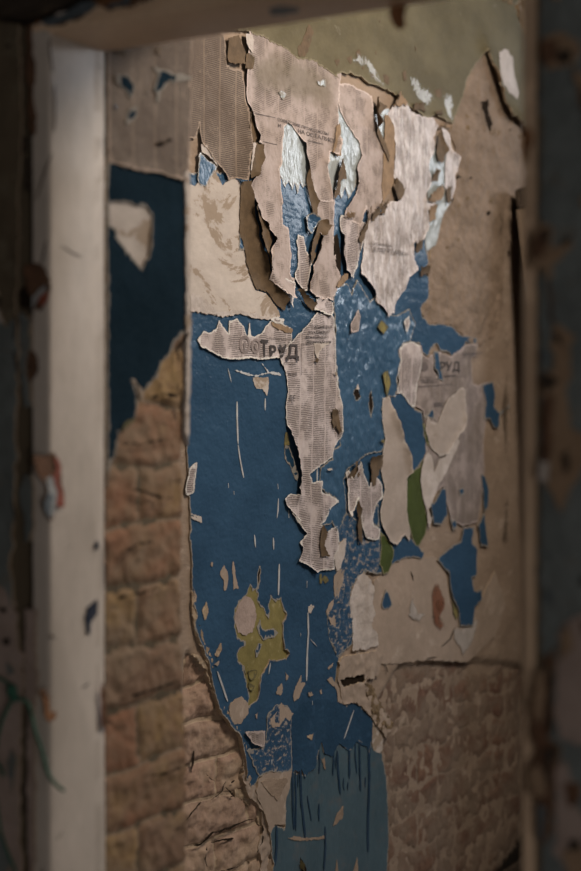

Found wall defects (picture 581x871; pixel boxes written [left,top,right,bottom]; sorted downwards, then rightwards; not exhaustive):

spalling [36,0,149,26]
peeling [116,74,138,126]
peeling [146,66,192,102]
peeling [237,0,523,356]
flaking render [530,223,574,284]
peeling [104,156,523,871]
flaking render [0,586,25,871]
flaking render [554,615,581,747]
flaking render [553,760,581,871]